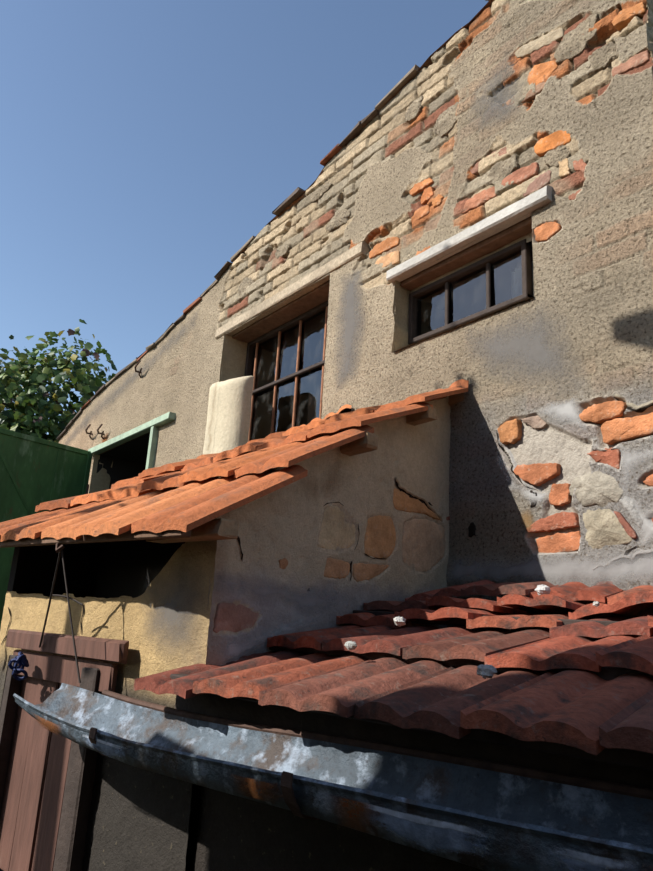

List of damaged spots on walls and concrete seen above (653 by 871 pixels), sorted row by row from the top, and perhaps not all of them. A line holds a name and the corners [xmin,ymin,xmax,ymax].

peeling [554,13,617,75]
peeling [433,102,459,138]
peeling [488,154,520,185]
peeling [543,145,570,168]
spalling [532,219,563,245]
spalling [496,395,653,555]
crack [395,477,443,522]
peeling [323,483,450,584]